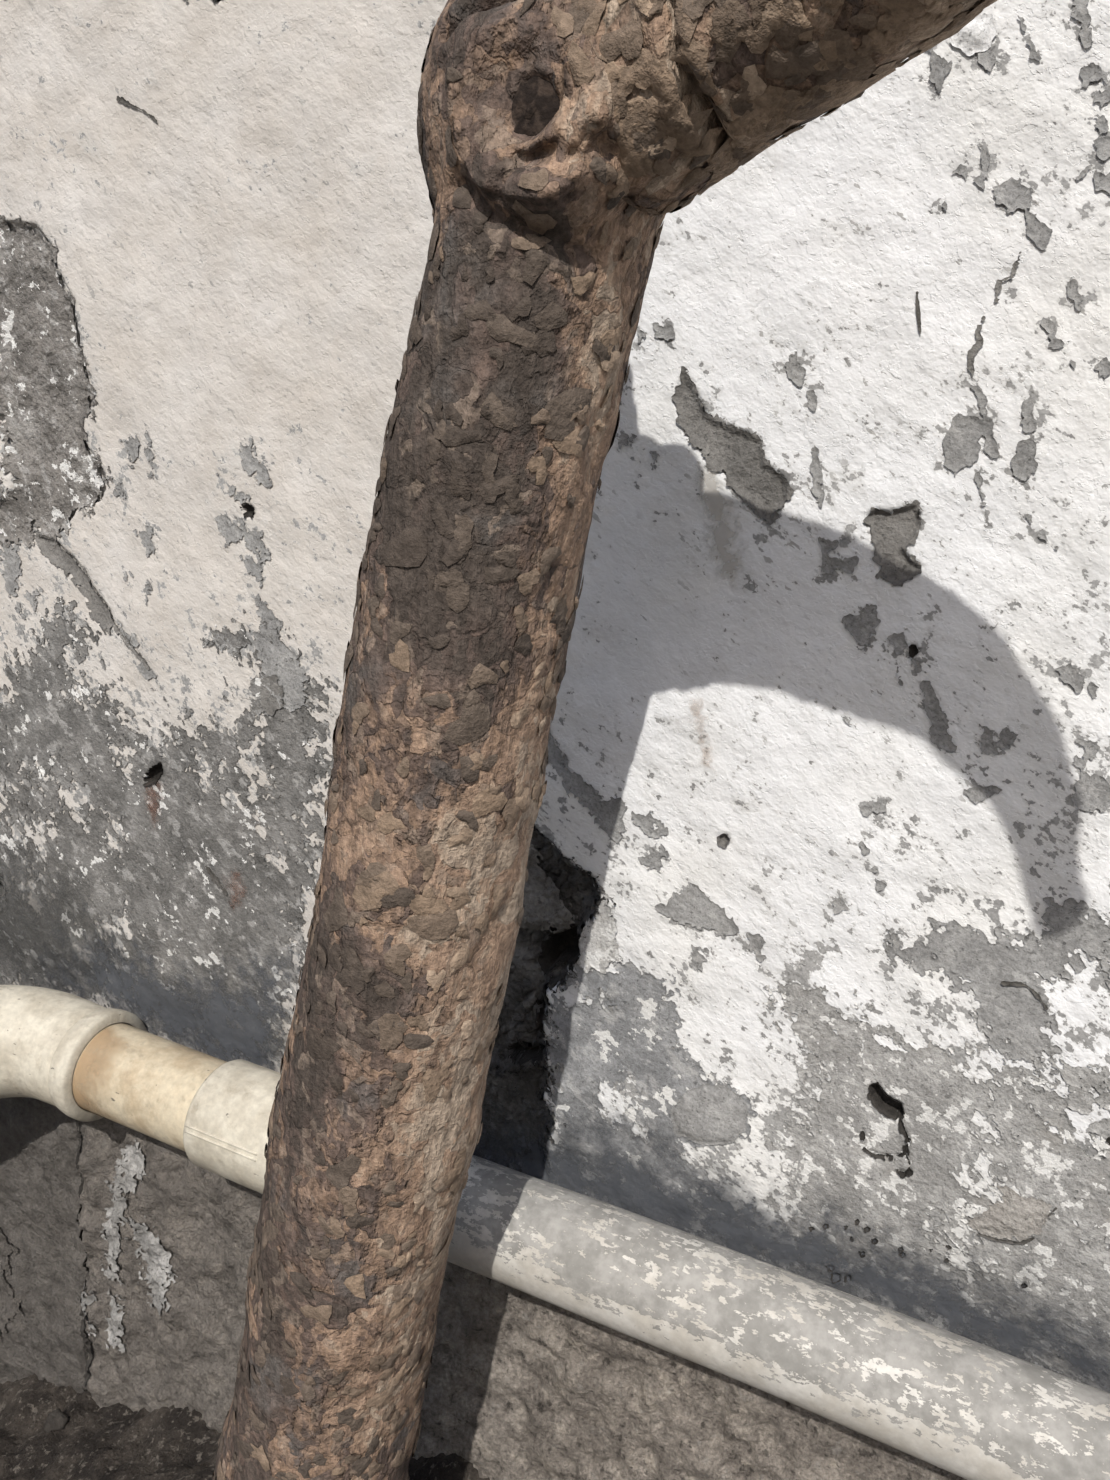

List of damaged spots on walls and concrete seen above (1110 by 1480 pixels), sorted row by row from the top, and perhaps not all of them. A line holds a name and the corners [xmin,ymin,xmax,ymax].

peeling [929,48,952,92]
peeling [1071,0,1110,194]
peeling [952,143,1053,250]
spalling [671,366,825,525]
peeling [785,351,818,411]
peeling [943,385,1038,506]
peeling [1040,319,1110,378]
spalling [818,500,923,587]
peeling [0,213,340,1073]
peeling [842,604,957,752]
peeling [546,733,670,871]
peeling [473,824,1110,1392]